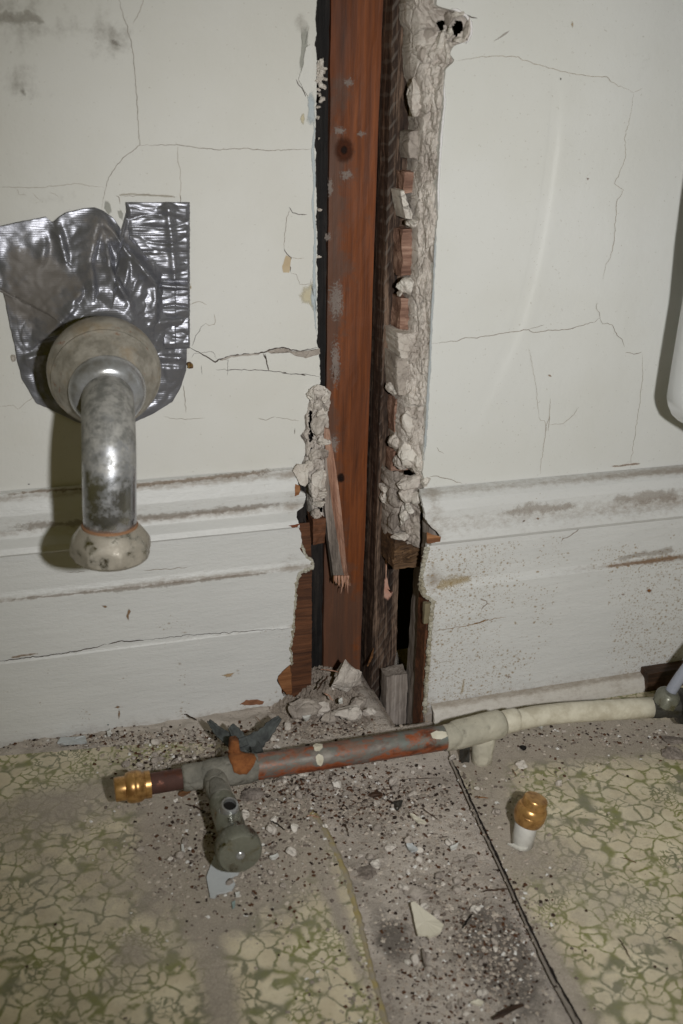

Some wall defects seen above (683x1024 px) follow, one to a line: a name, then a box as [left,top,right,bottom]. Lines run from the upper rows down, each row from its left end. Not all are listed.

crack [11,0,308,204]
peeling [282,31,317,328]
crack [458,15,642,269]
spalling [381,0,471,548]
crack [168,301,319,420]
spalling [290,384,331,528]
crack [429,304,643,472]
crack [6,629,282,661]
spalling [278,665,292,695]